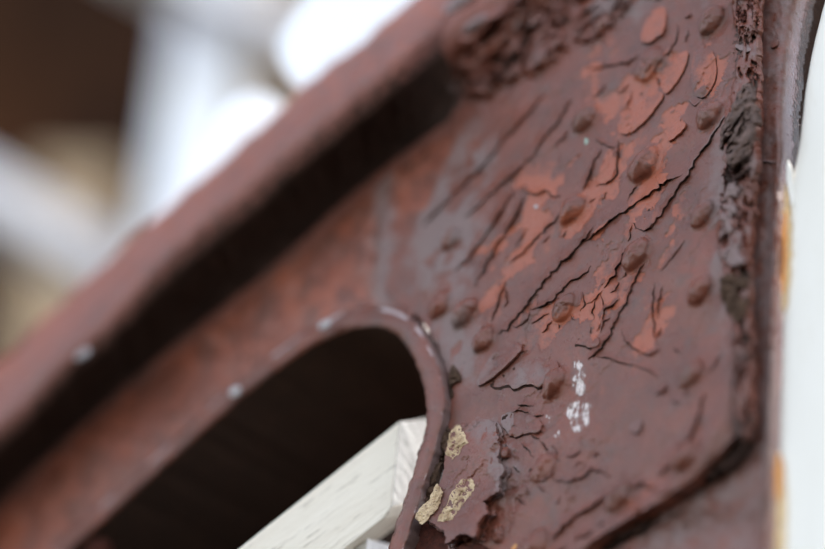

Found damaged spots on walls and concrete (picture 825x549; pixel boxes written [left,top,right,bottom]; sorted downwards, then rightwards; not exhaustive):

peeling [641,7,667,46]
crack [664,11,692,56]
peeling [597,149,617,183]
peeling [618,46,718,136]
peeling [668,120,687,142]
crack [416,50,725,404]
rust [778,189,792,310]
peeling [477,341,560,392]
peeling [427,412,544,548]
crack [510,397,615,549]
crack [615,483,689,549]
rust [775,453,785,549]